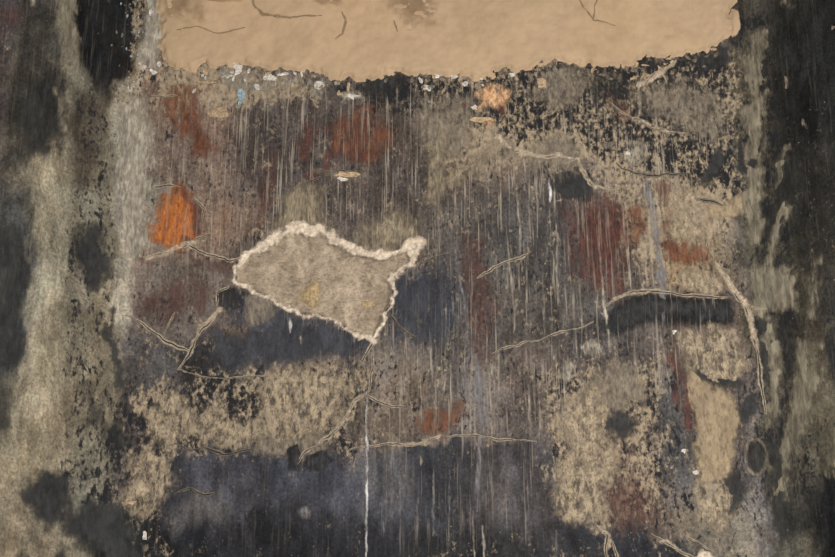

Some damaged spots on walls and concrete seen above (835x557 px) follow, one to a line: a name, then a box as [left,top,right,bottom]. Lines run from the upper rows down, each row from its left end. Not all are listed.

crack [252,0,347,39]
crack [580,0,616,26]
rust [149,183,202,250]
spalling [232,182,426,344]
water stain [470,364,491,488]